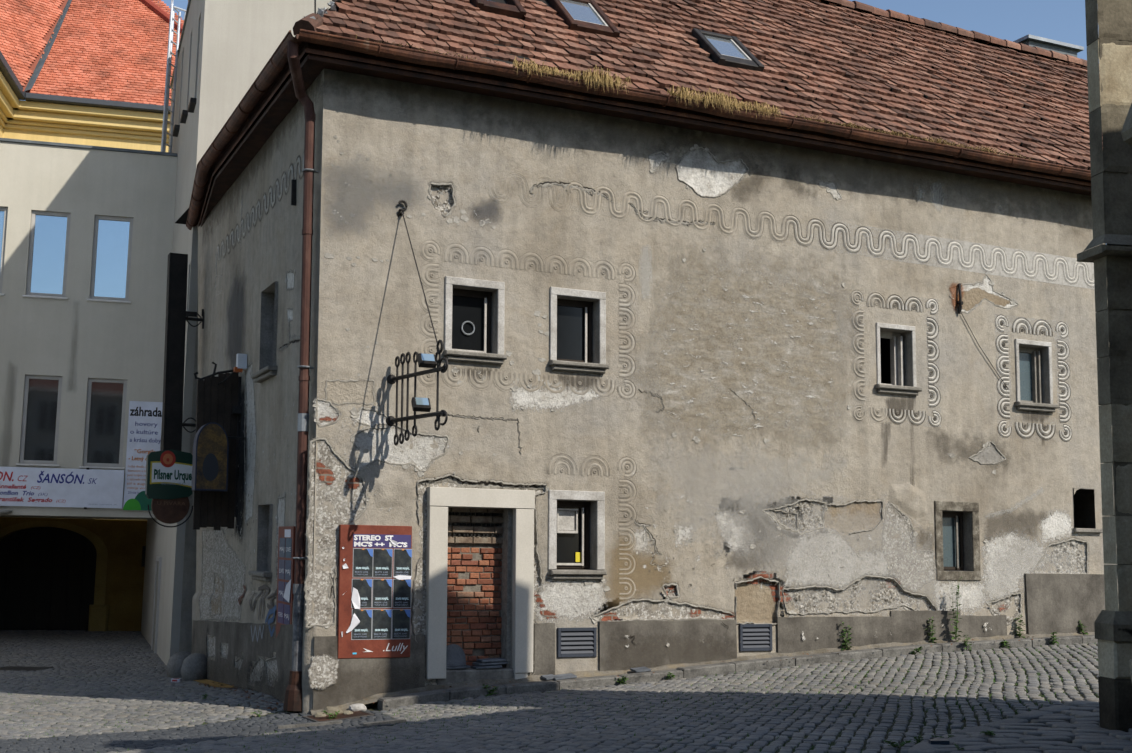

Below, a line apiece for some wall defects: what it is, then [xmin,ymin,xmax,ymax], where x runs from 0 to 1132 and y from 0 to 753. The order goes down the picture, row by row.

peeling [648,144,749,198]
water stain [474,202,498,219]
peeling [949,274,1019,314]
peeling [506,350,606,412]
spalling [199,362,610,658]
spalling [629,477,1073,625]
spalling [207,635,278,687]
spalling [308,654,338,689]